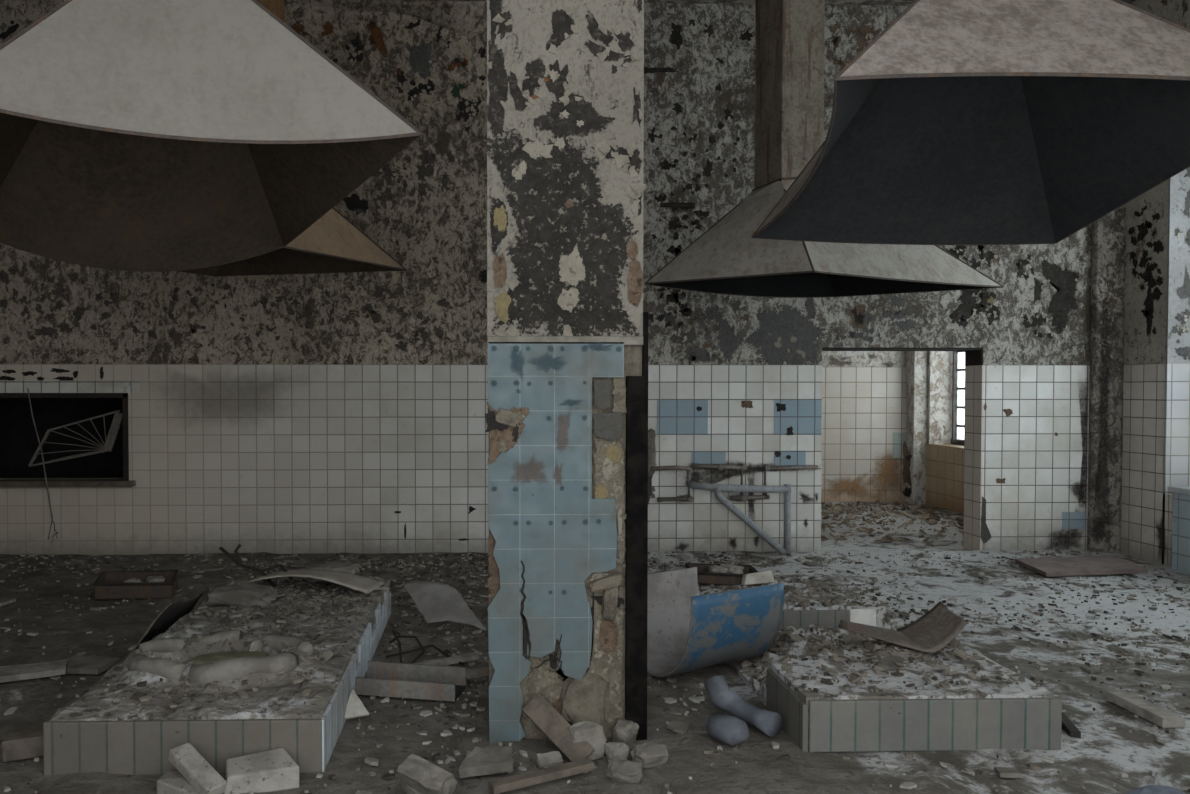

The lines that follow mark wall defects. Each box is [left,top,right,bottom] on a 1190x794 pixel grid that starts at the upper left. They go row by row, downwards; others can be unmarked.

peeling [455,0,930,367]
peeling [1174,167,1190,247]
peeling [946,245,998,269]
peeling [949,289,1001,327]
peeling [1016,254,1079,339]
peeling [1128,205,1190,360]
spalling [485,401,529,464]
flaking render [612,377,627,414]
water stain [1079,297,1110,541]
crack [520,560,564,673]
spalling [586,435,626,740]
spalling [526,643,573,726]